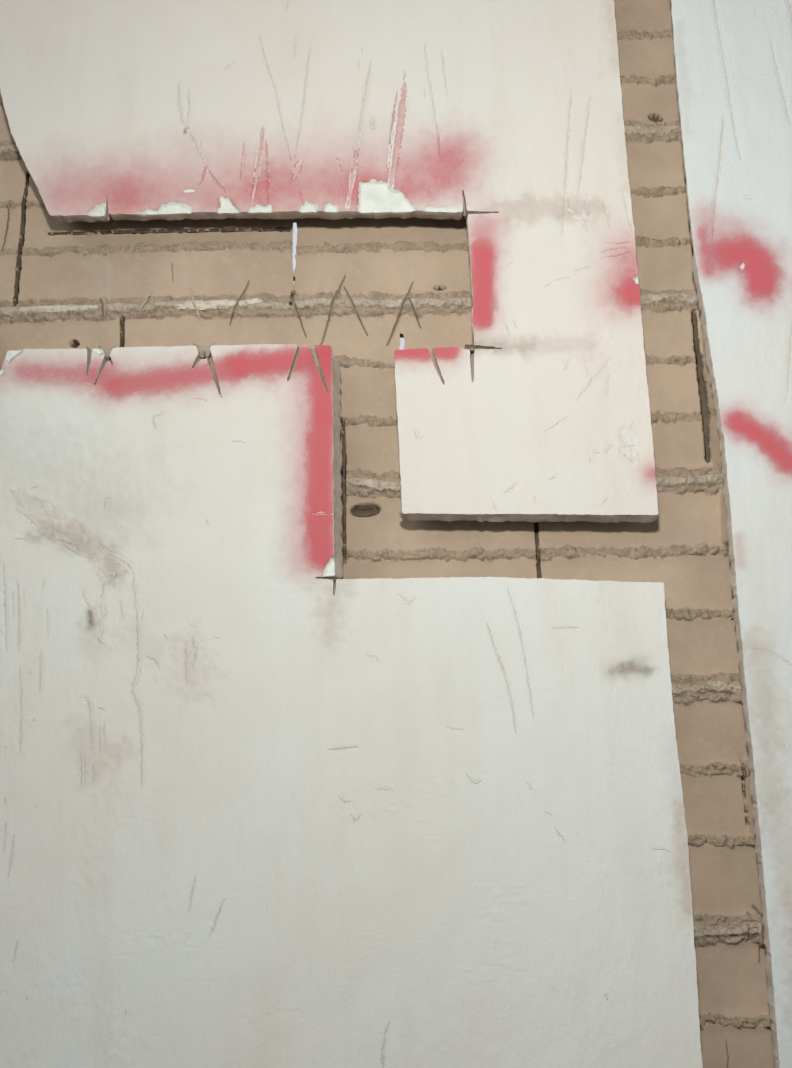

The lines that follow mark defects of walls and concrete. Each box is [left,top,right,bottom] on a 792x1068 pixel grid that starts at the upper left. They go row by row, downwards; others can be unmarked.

spalling [88,203,106,216]
spalling [137,189,195,215]